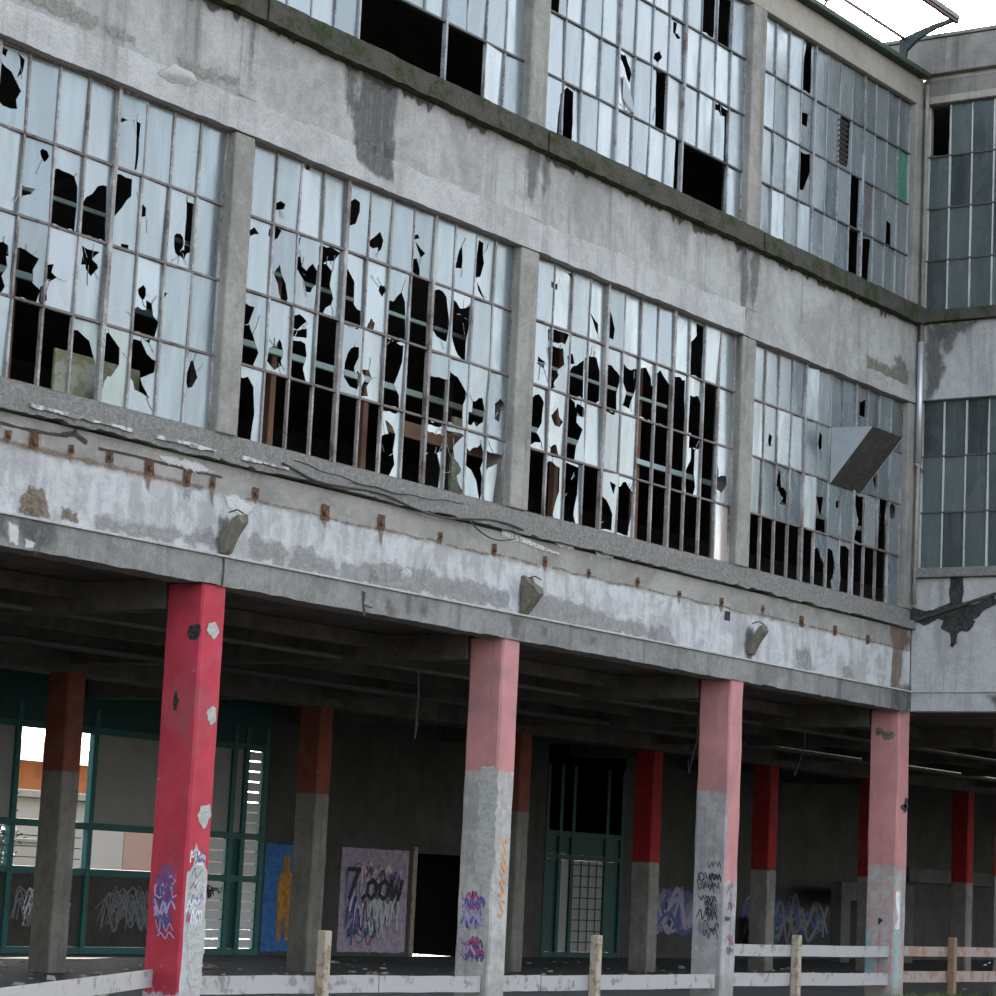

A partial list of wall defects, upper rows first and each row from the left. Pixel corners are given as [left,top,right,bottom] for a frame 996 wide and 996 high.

water stain [318,51,490,180]
water stain [501,134,630,199]
water stain [641,199,901,319]
rust [0,430,216,504]
peeling [7,522,34,548]
spalling [19,486,50,518]
rust [246,487,396,543]
peeling [187,622,219,640]
rust [454,544,742,613]
spalling [910,577,996,647]
peeling [198,804,211,829]
peeling [185,844,207,990]